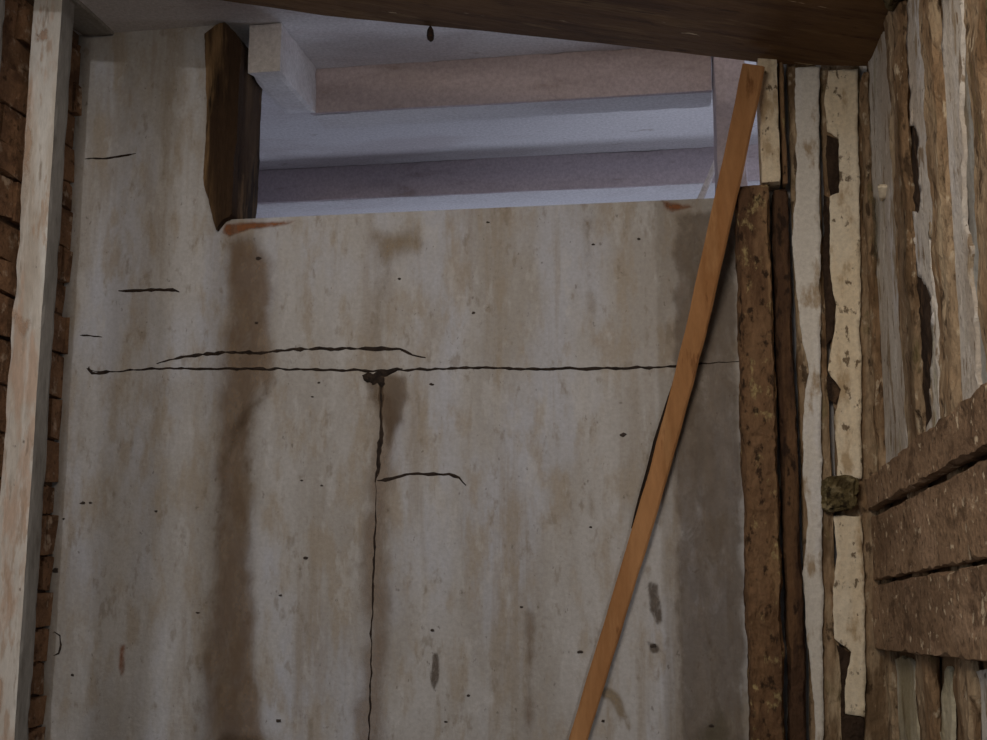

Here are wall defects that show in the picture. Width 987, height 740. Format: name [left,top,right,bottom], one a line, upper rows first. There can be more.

crack [86,152,136,160]
peeling [906,0,940,432]
peeling [941,0,987,400]
crack [118,286,180,294]
peeling [792,32,908,740]
water stain [206,242,270,740]
crack [87,346,739,740]
crack [53,632,62,656]
peeling [895,656,920,740]
peeling [940,666,956,740]
peeling [976,669,987,740]